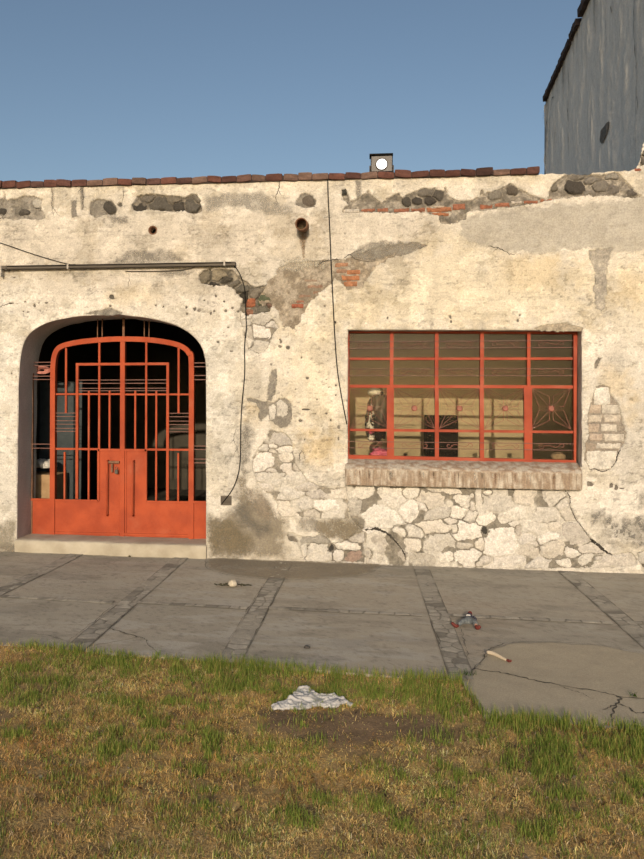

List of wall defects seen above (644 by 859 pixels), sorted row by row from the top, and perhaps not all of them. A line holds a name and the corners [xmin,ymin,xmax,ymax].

spalling [0,196,45,221]
spalling [90,200,122,218]
spalling [133,195,202,214]
flaking render [342,173,640,224]
flaking render [185,242,427,330]
peeling [247,363,340,440]
flaking render [584,385,627,471]
water stain [208,477,285,558]
water stain [299,519,359,540]
crack [460,627,644,722]